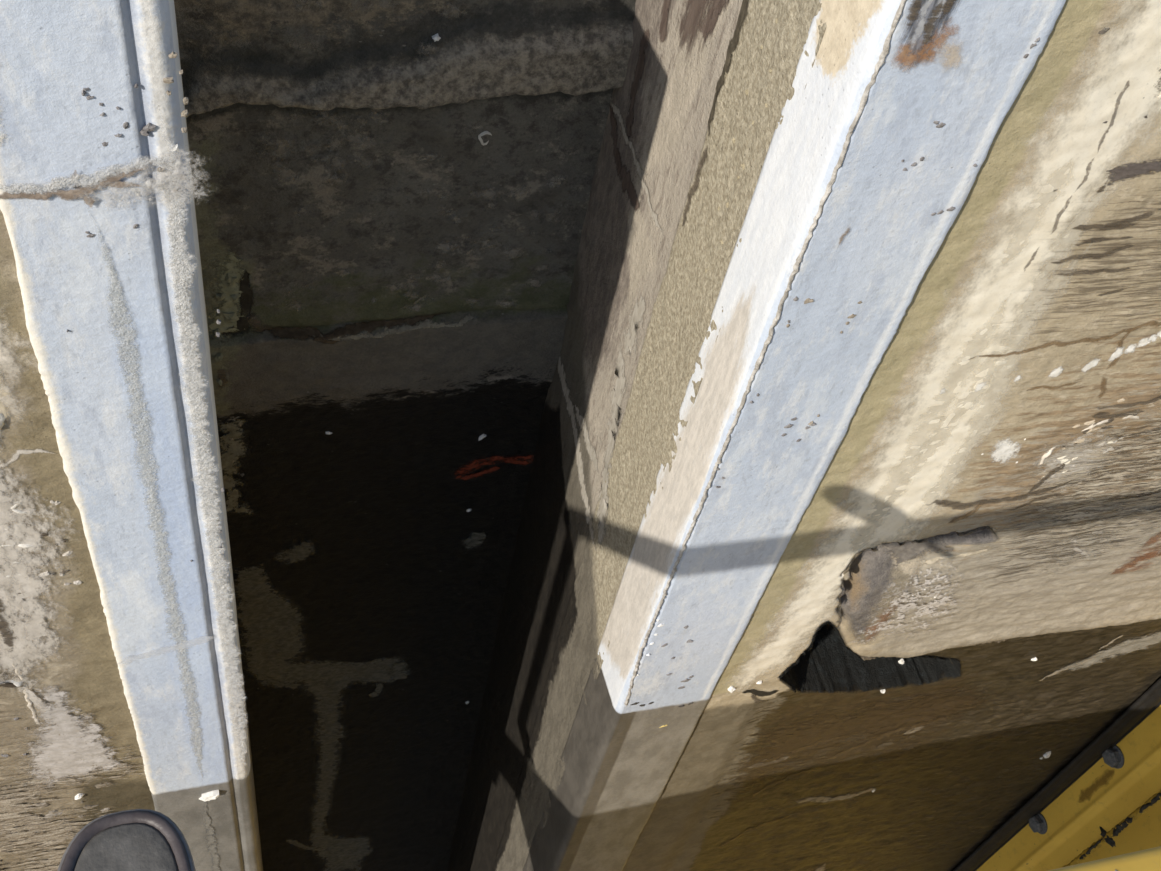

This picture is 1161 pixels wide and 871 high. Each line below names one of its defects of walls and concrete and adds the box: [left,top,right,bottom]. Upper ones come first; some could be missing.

rust [895,0,960,70]
damp [0,323,28,416]
damp [733,0,1161,691]
crack [969,321,1161,397]
rust [1113,533,1161,574]
spalling [779,526,998,694]
crack [0,680,53,723]
damp [233,564,410,871]